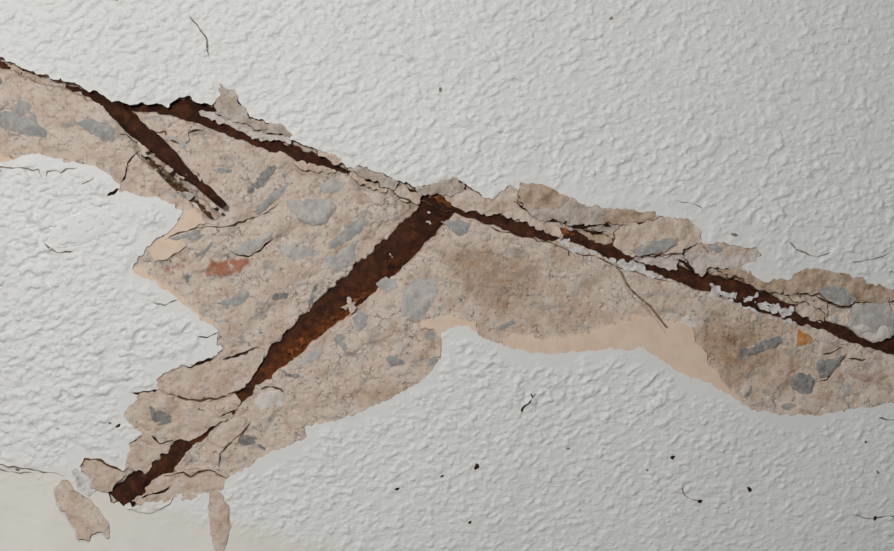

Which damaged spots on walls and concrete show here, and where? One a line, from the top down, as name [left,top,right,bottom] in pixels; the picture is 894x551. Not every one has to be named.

spalling [0,58,894,360]
rust [205,259,249,276]
spalling [113,213,894,506]
peeling [54,480,110,541]
peeling [71,458,125,502]
peeling [208,489,231,551]